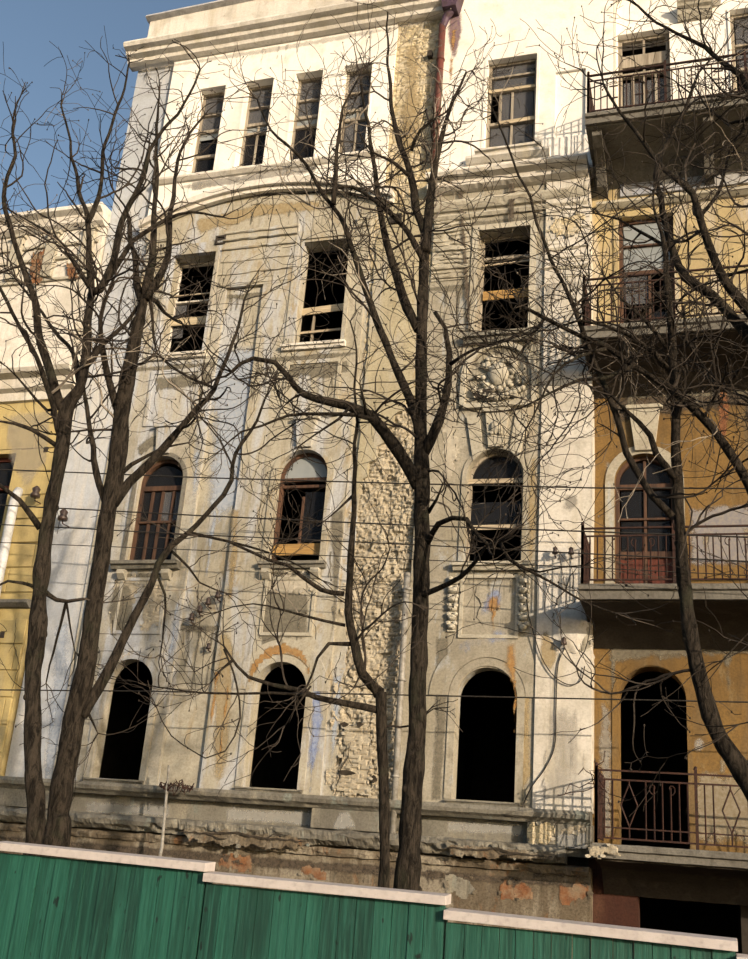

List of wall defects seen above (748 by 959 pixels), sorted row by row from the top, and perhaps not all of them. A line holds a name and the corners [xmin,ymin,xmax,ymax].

rust [449,11,461,76]
water stain [136,337,267,547]
peeling [690,505,748,565]
spalling [332,719,377,796]
spalling [184,827,310,873]
spalling [445,821,586,861]
spalling [585,844,621,859]
peeling [298,865,326,880]
peeling [444,874,478,899]
peeling [498,880,533,901]
peeling [559,881,594,905]